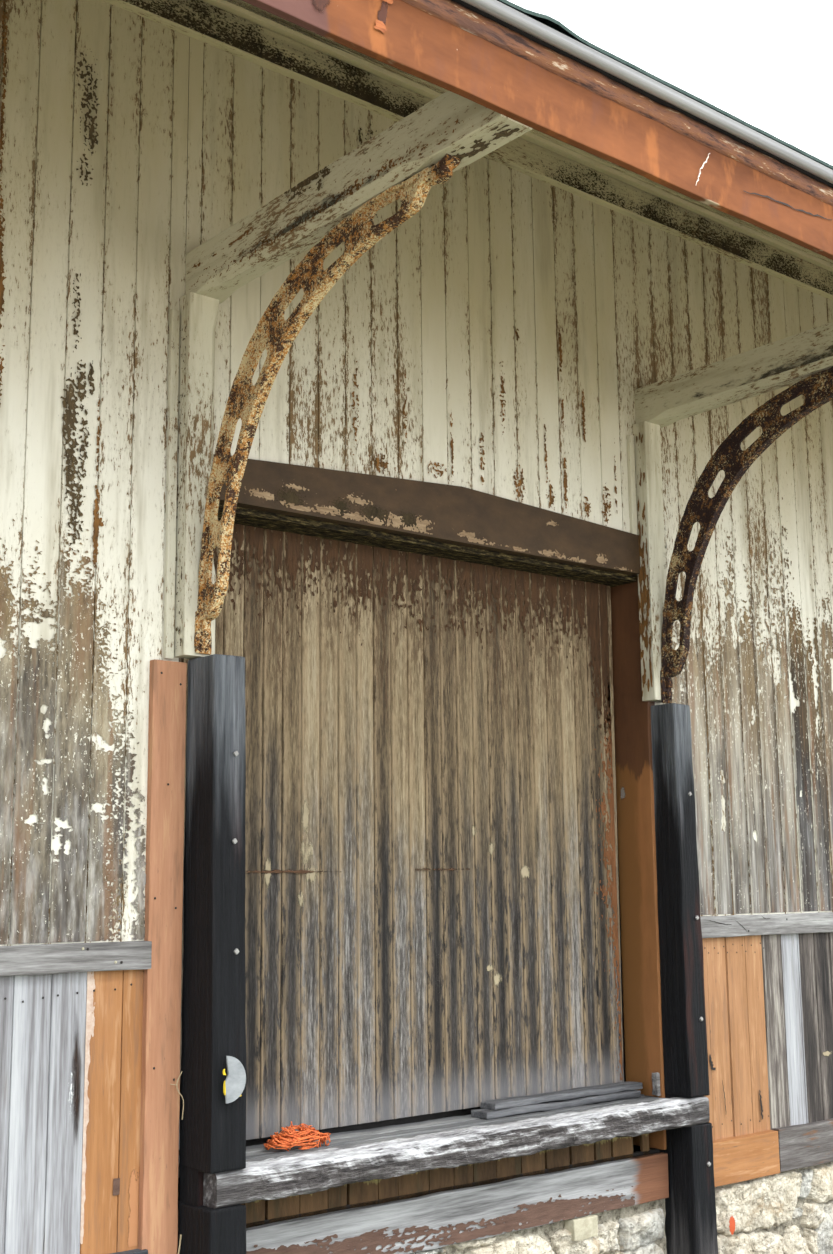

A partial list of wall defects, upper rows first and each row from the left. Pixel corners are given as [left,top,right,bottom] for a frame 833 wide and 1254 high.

peeling [0,1,8,329]
peeling [76,52,100,186]
damp [122,0,430,117]
peeling [191,106,520,287]
damp [514,149,833,294]
peeling [0,270,149,945]
peeling [245,484,435,534]
peeling [457,465,653,697]
peeling [544,424,568,526]
peeling [583,456,617,526]
peeling [663,513,833,915]
peeling [246,1186,635,1254]